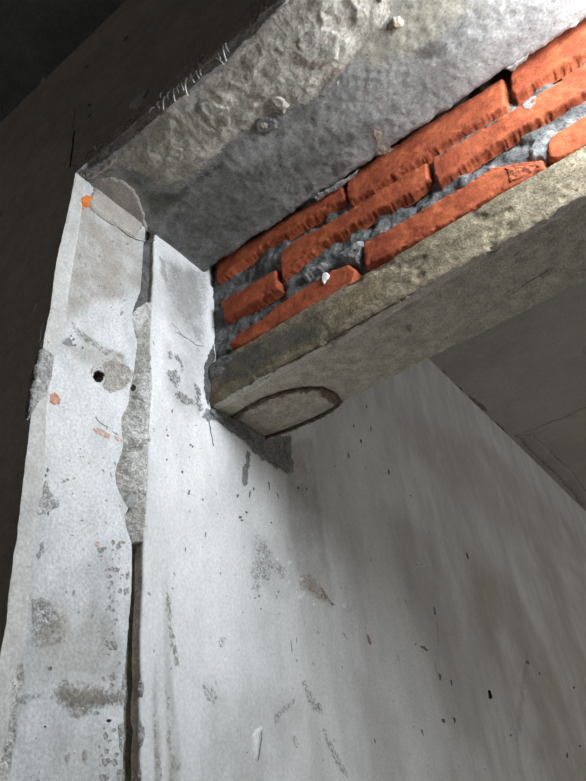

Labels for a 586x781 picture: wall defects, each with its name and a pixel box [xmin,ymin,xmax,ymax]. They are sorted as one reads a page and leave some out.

crack [69,114,104,179]
spalling [84,0,286,179]
spalling [313,170,358,201]
spalling [506,53,529,71]
spalling [214,195,586,410]
spalling [25,322,54,420]
spalling [97,240,155,655]
crack [441,370,586,435]
spalling [0,663,25,781]
spalling [93,662,126,781]